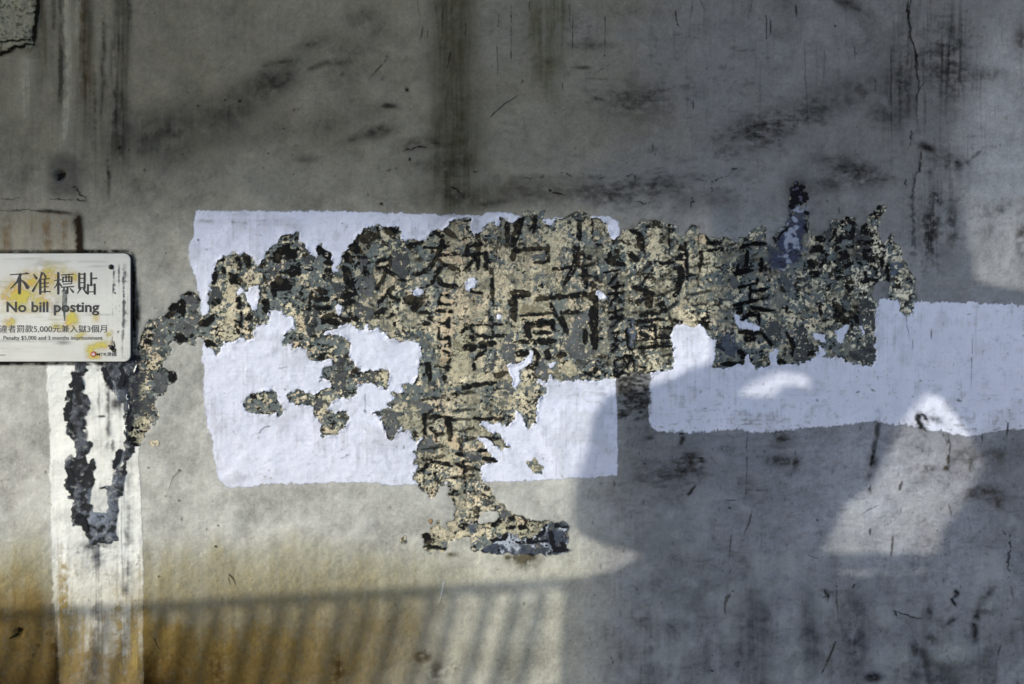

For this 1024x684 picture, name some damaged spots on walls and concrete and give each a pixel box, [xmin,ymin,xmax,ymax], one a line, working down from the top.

leakage [435,0,470,208]
crack [904,1,924,189]
peeling [126,181,917,556]